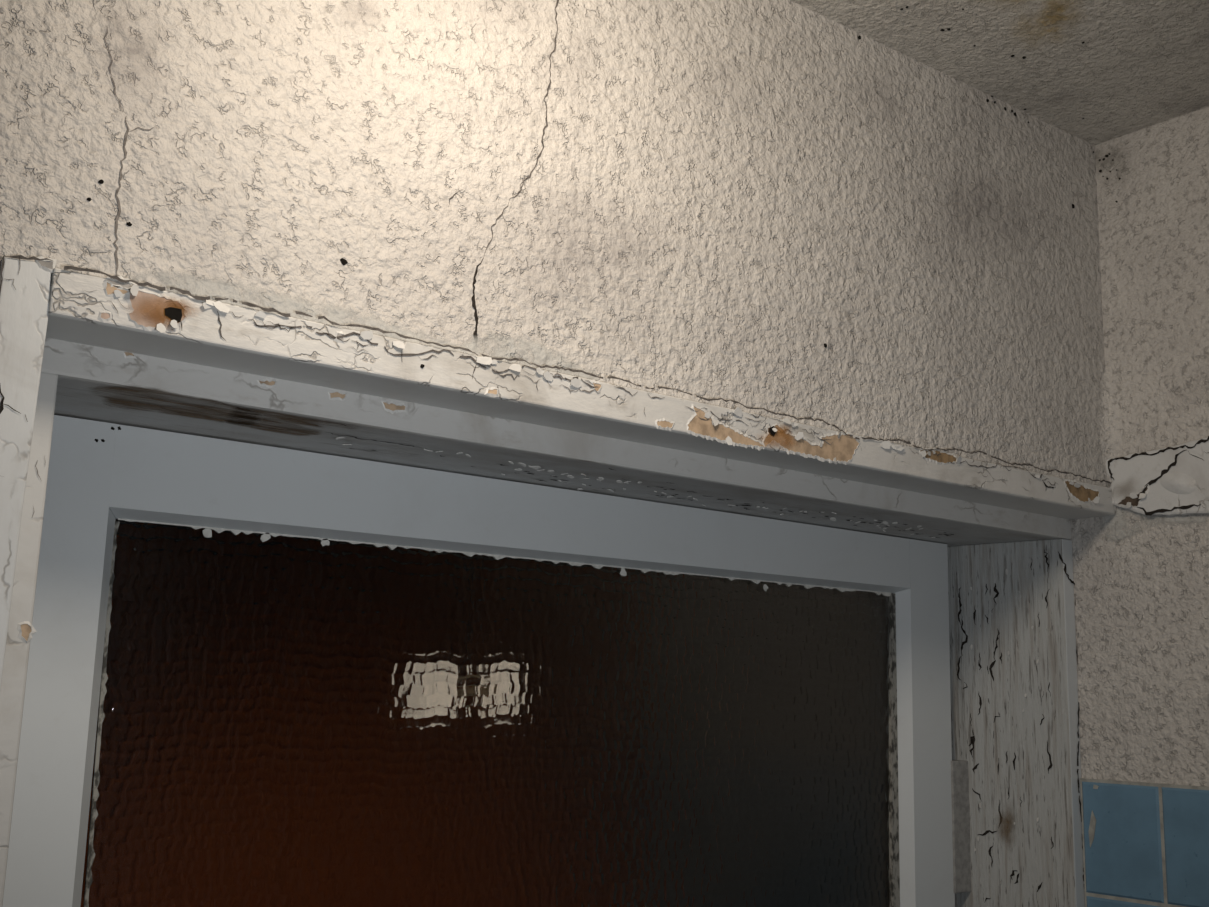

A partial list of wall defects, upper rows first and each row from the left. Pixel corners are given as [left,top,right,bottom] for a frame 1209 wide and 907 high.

crack [0,0,1209,516]
water stain [100,387,338,436]
peeling [655,404,861,465]
peeling [1064,479,1100,504]
crack [1058,552,1078,661]
crack [1076,707,1084,881]